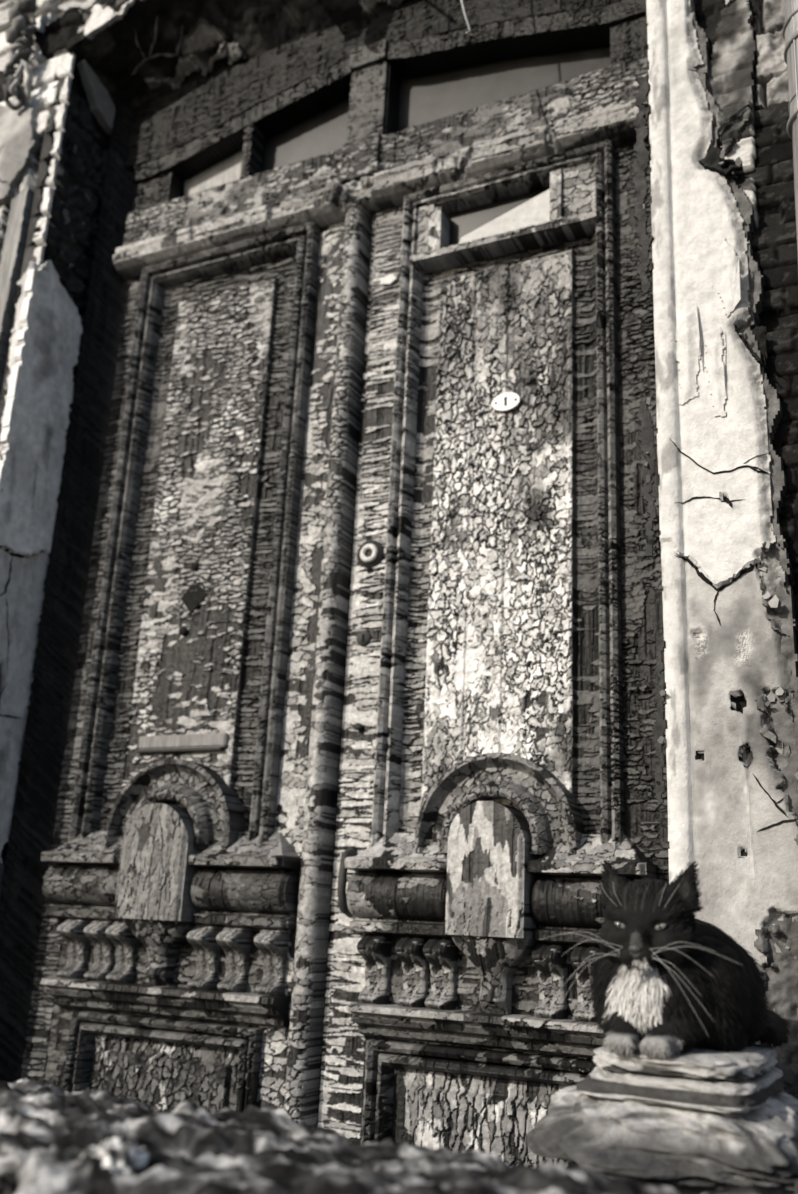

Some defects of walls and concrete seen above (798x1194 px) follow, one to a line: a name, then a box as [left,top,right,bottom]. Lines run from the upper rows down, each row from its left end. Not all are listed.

spalling [34,9,85,60]
spalling [695,0,725,61]
spalling [0,71,13,102]
flaking render [145,41,246,90]
flaking render [633,74,653,296]
spalling [698,146,744,176]
spalling [33,138,100,303]
spalling [734,325,768,372]
crack [670,436,771,507]
crack [674,545,778,627]
crack [0,544,47,719]